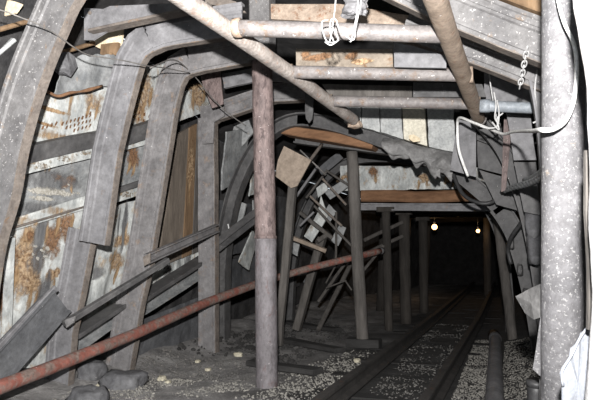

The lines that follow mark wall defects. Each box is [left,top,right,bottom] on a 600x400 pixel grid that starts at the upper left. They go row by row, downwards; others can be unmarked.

rust [345,52,373,65]
rust [41,94,73,115]
rust [132,75,153,124]
rust [127,147,139,175]
rust [13,208,74,310]
rust [109,223,130,284]